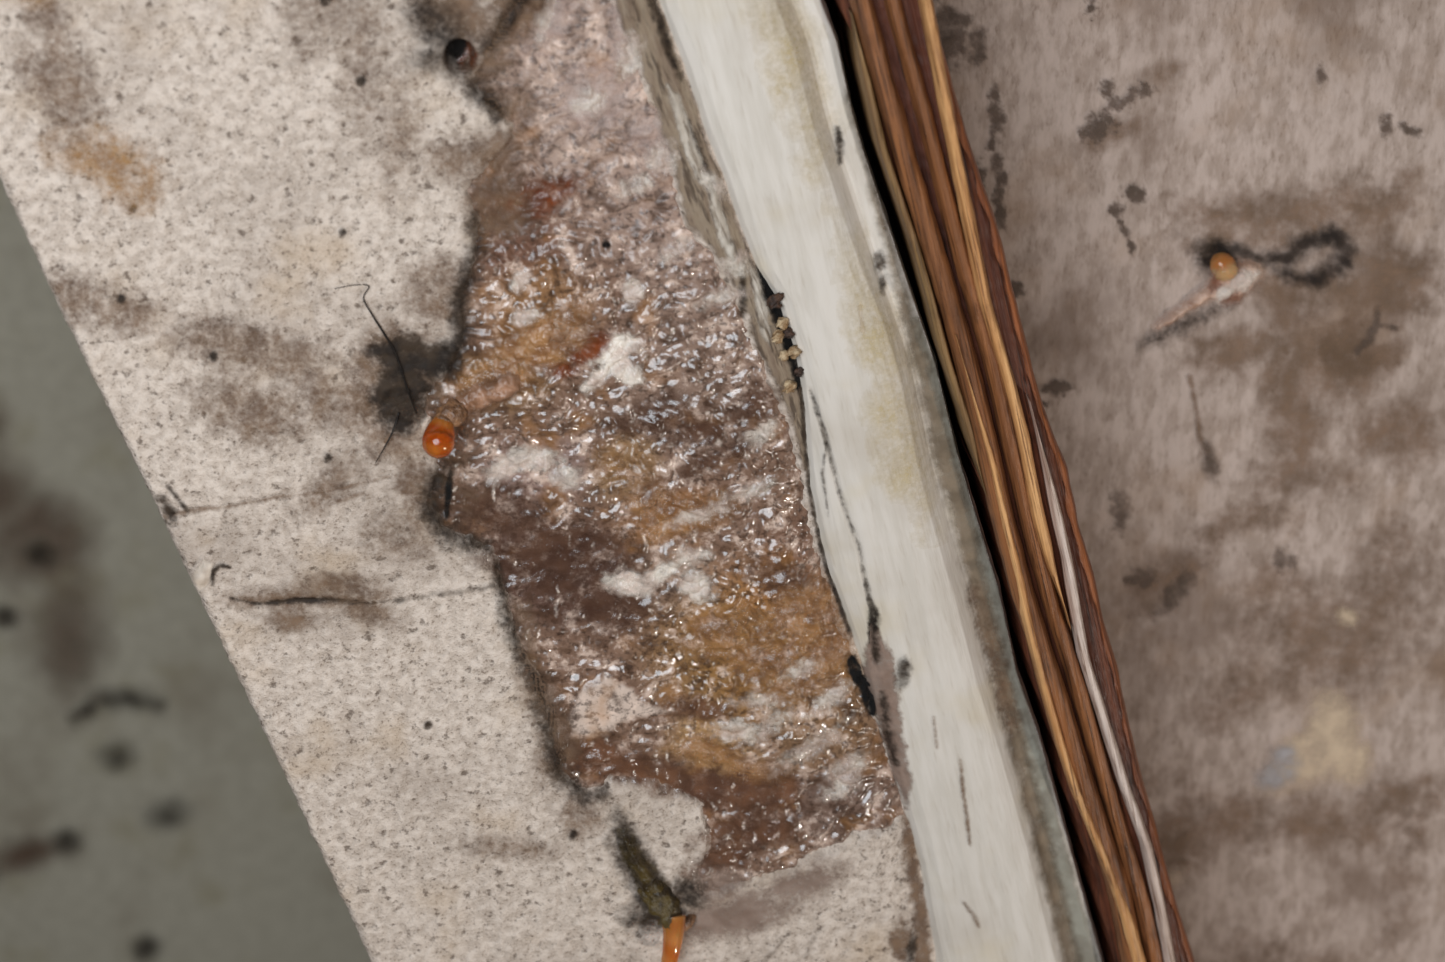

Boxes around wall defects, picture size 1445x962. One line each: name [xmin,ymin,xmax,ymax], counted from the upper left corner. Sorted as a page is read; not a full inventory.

leakage [415,0,549,41]
leakage [411,258,472,319]
leakage [869,607,879,661]
leakage [898,660,910,686]
leakage [881,697,898,765]